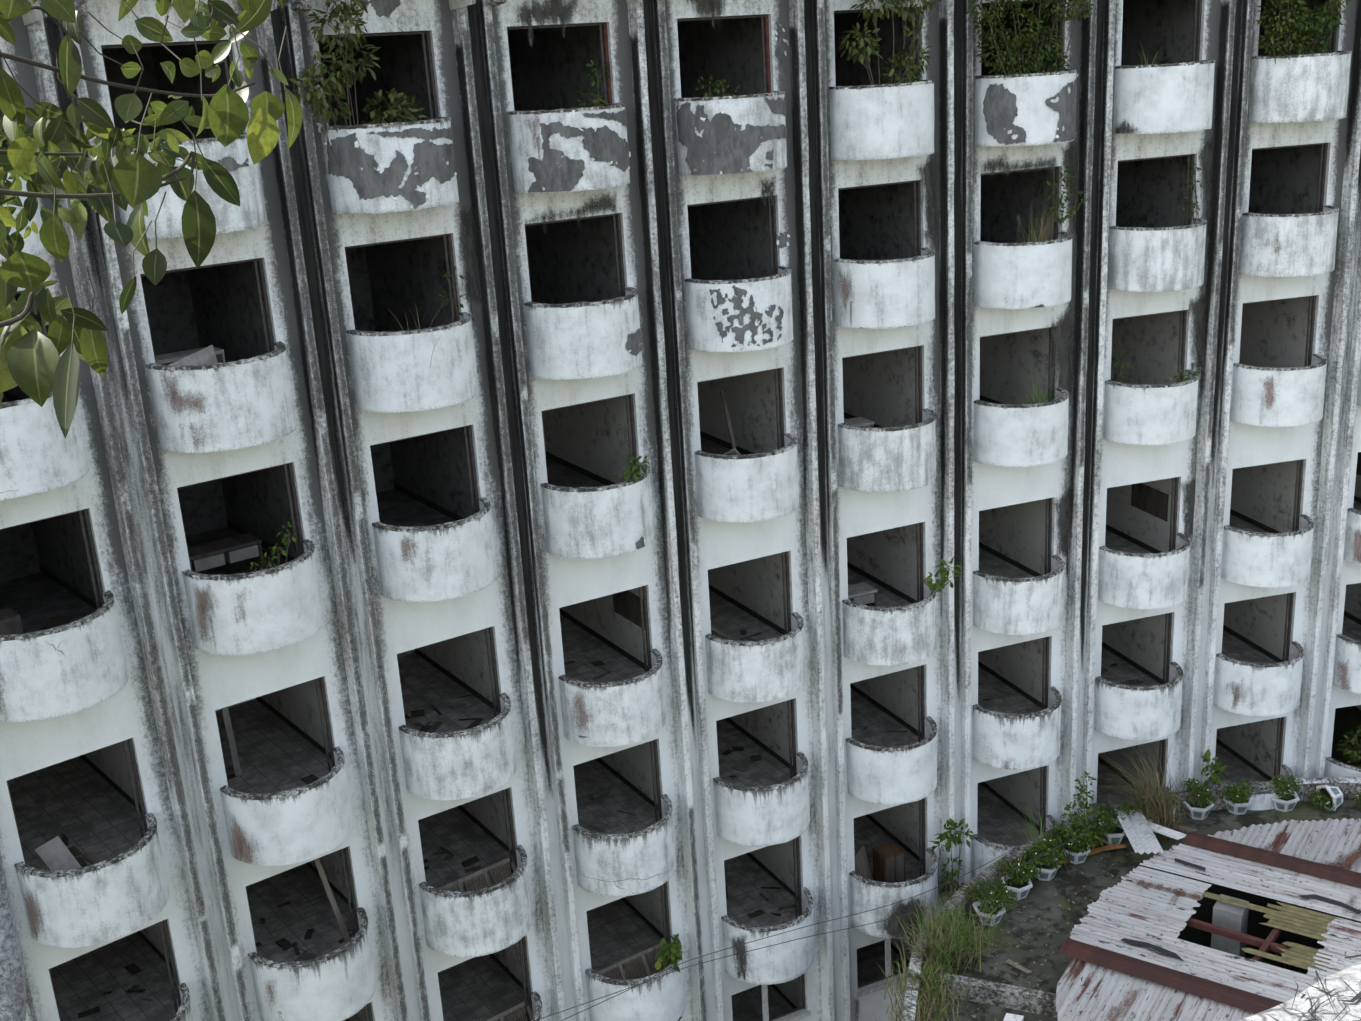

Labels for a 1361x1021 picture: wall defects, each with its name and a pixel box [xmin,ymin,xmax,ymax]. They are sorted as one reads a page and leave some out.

peeling [311,99,457,209]
peeling [528,109,631,192]
peeling [677,96,787,175]
peeling [983,83,1027,145]
peeling [709,285,784,349]
leakage [99,372,128,483]
leakage [123,330,238,1021]
rust [1137,880,1202,900]
rust [1324,846,1361,870]
leakage [236,968,250,1021]
rust [1107,992,1137,1021]
crack [1251,952,1361,1021]